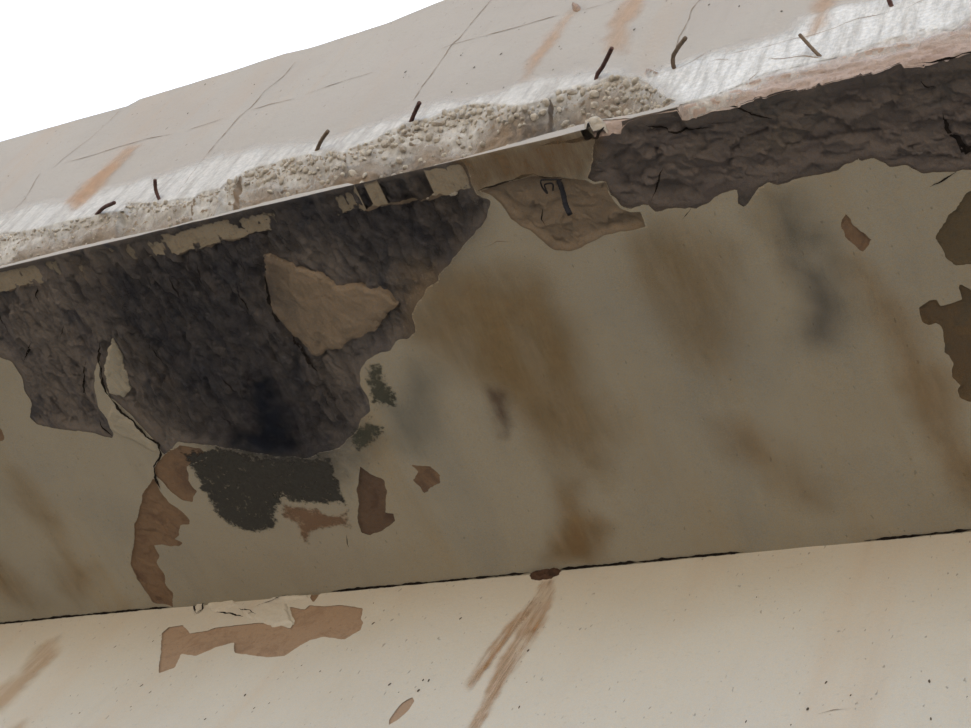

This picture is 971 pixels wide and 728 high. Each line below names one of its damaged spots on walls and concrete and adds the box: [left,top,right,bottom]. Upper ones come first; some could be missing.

spalling [0,16,971,502]
peeling [130,479,190,607]
peeling [356,467,395,535]
peeling [152,594,375,673]